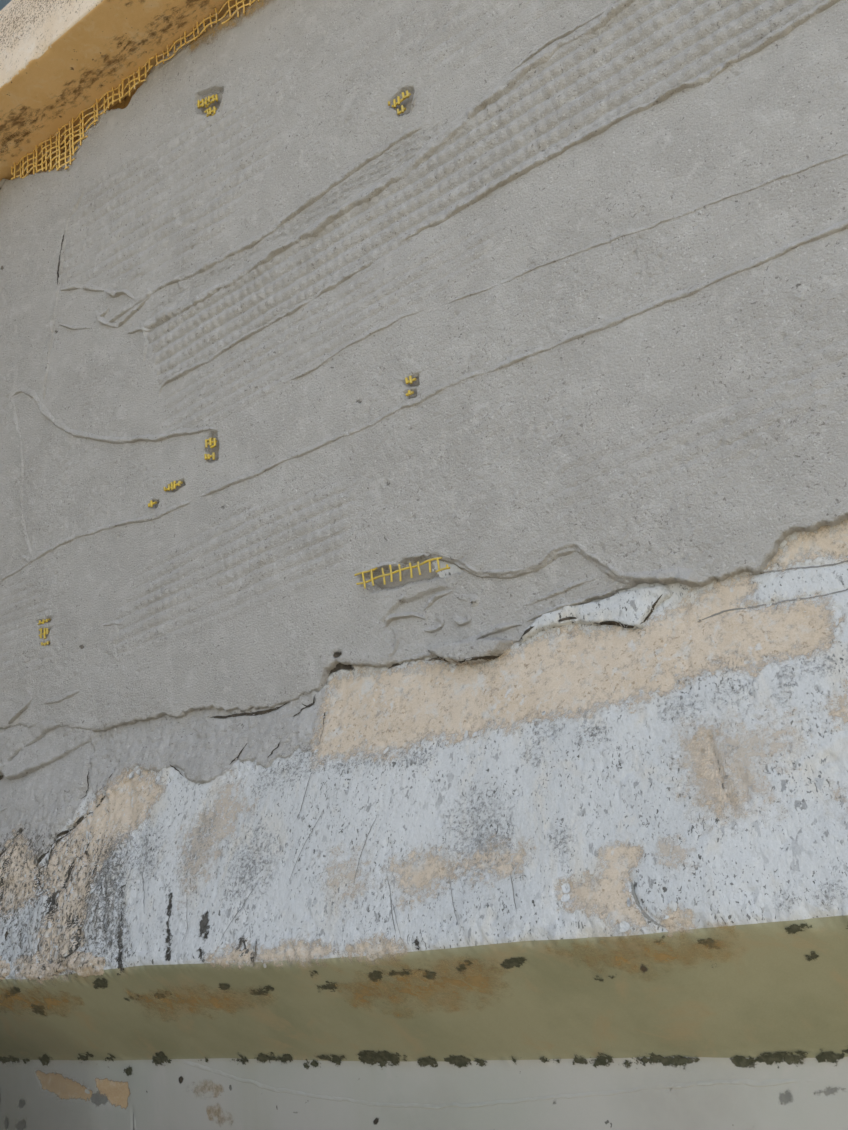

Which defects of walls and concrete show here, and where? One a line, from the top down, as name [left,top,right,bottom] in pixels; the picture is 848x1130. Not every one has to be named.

peeling [764,520,848,572]
flaking render [354,552,480,633]
flaking render [38,618,51,646]
peeling [311,574,845,769]
peeling [683,725,745,818]
peeling [0,767,166,998]
peeling [206,933,436,992]
peeling [389,836,535,909]
peeling [501,957,526,969]
peeling [556,843,720,968]
peeling [785,923,812,934]